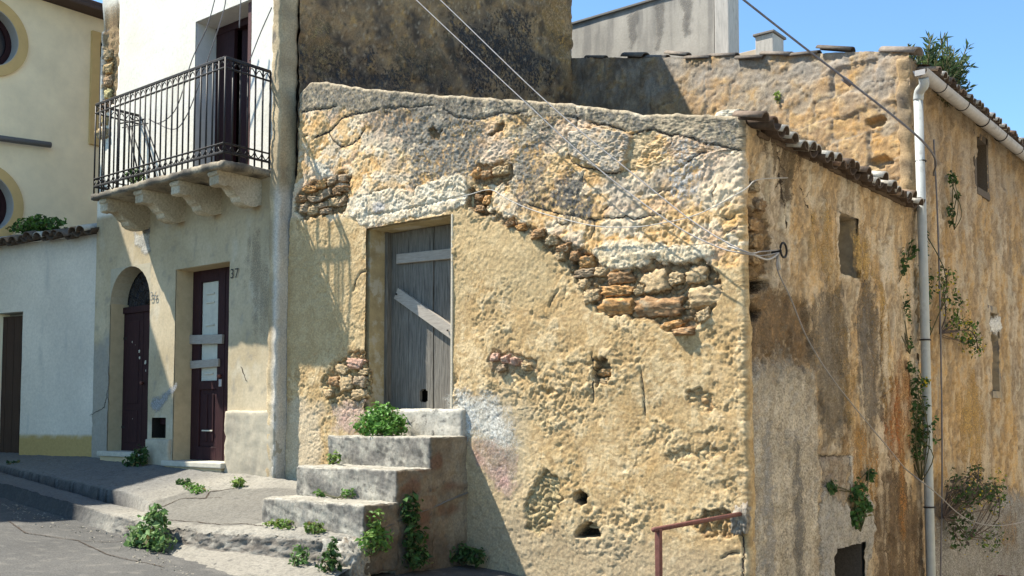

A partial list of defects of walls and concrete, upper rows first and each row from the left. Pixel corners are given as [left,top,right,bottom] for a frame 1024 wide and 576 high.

water stain [681,0,692,35]
crack [301,88,525,148]
water stain [298,0,658,225]
spalling [294,170,352,220]
spalling [468,159,723,336]
spalling [321,350,374,403]
spalling [488,349,540,381]
water stain [752,203,893,576]
spalling [579,522,601,536]